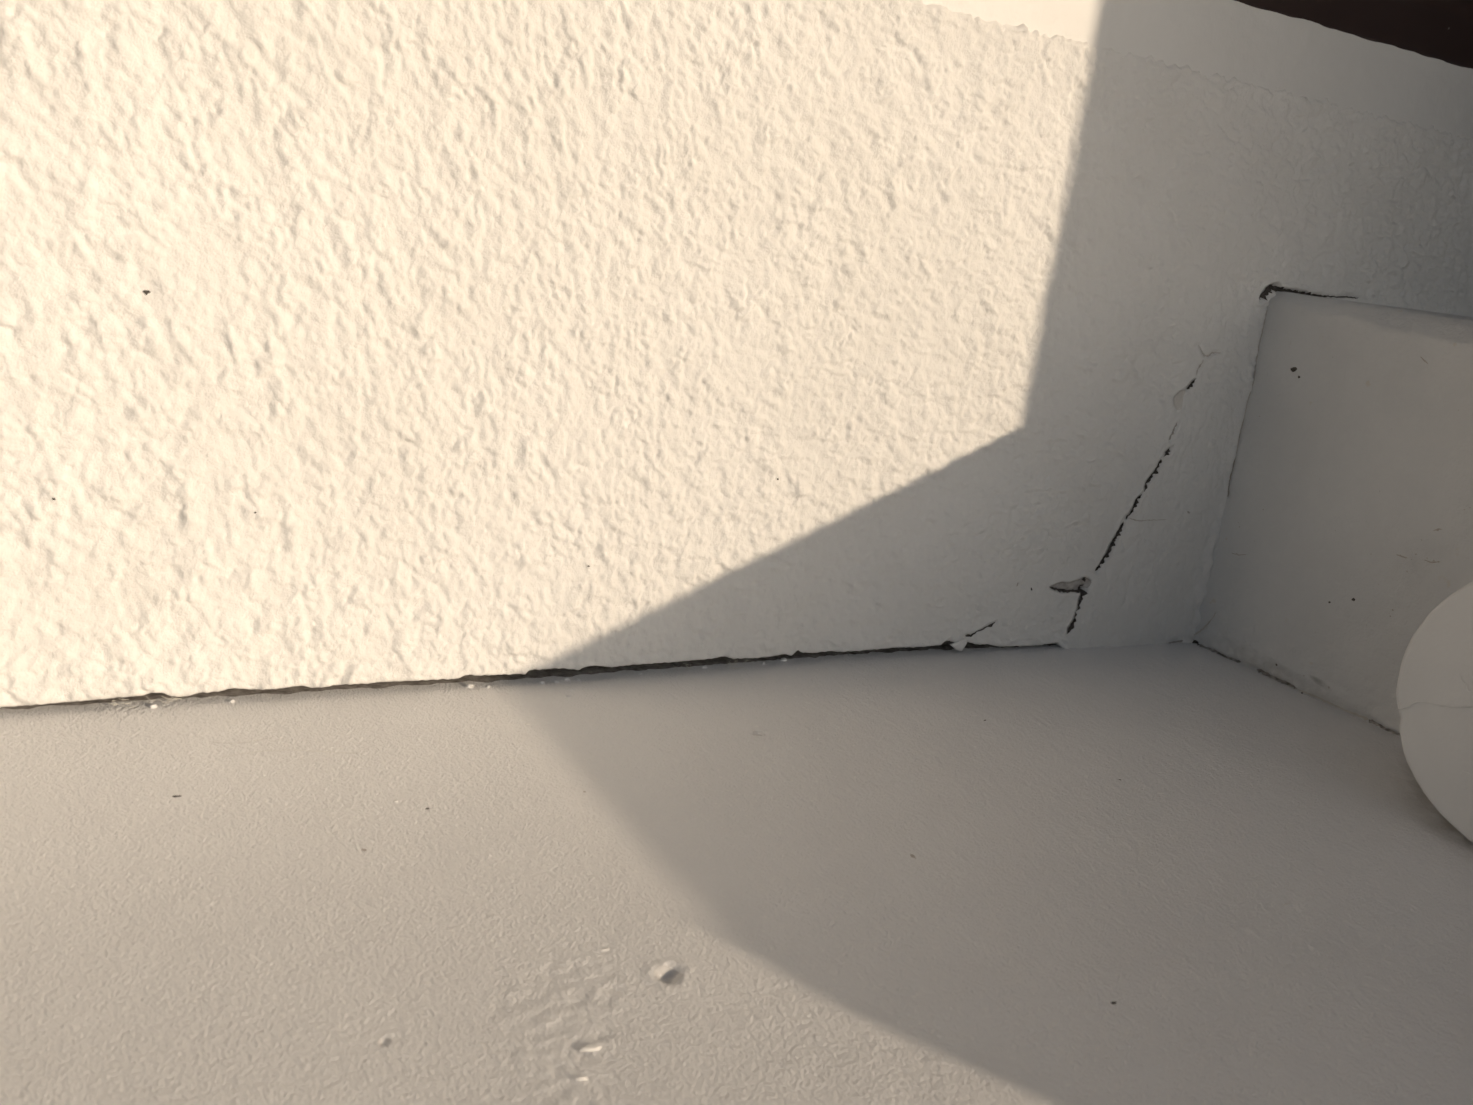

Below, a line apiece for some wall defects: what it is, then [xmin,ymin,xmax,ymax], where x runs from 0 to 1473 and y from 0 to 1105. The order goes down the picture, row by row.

crack [1187,345,1221,389]
crack [1227,284,1358,497]
spalling [1049,577,1091,593]
crack [1067,423,1190,634]